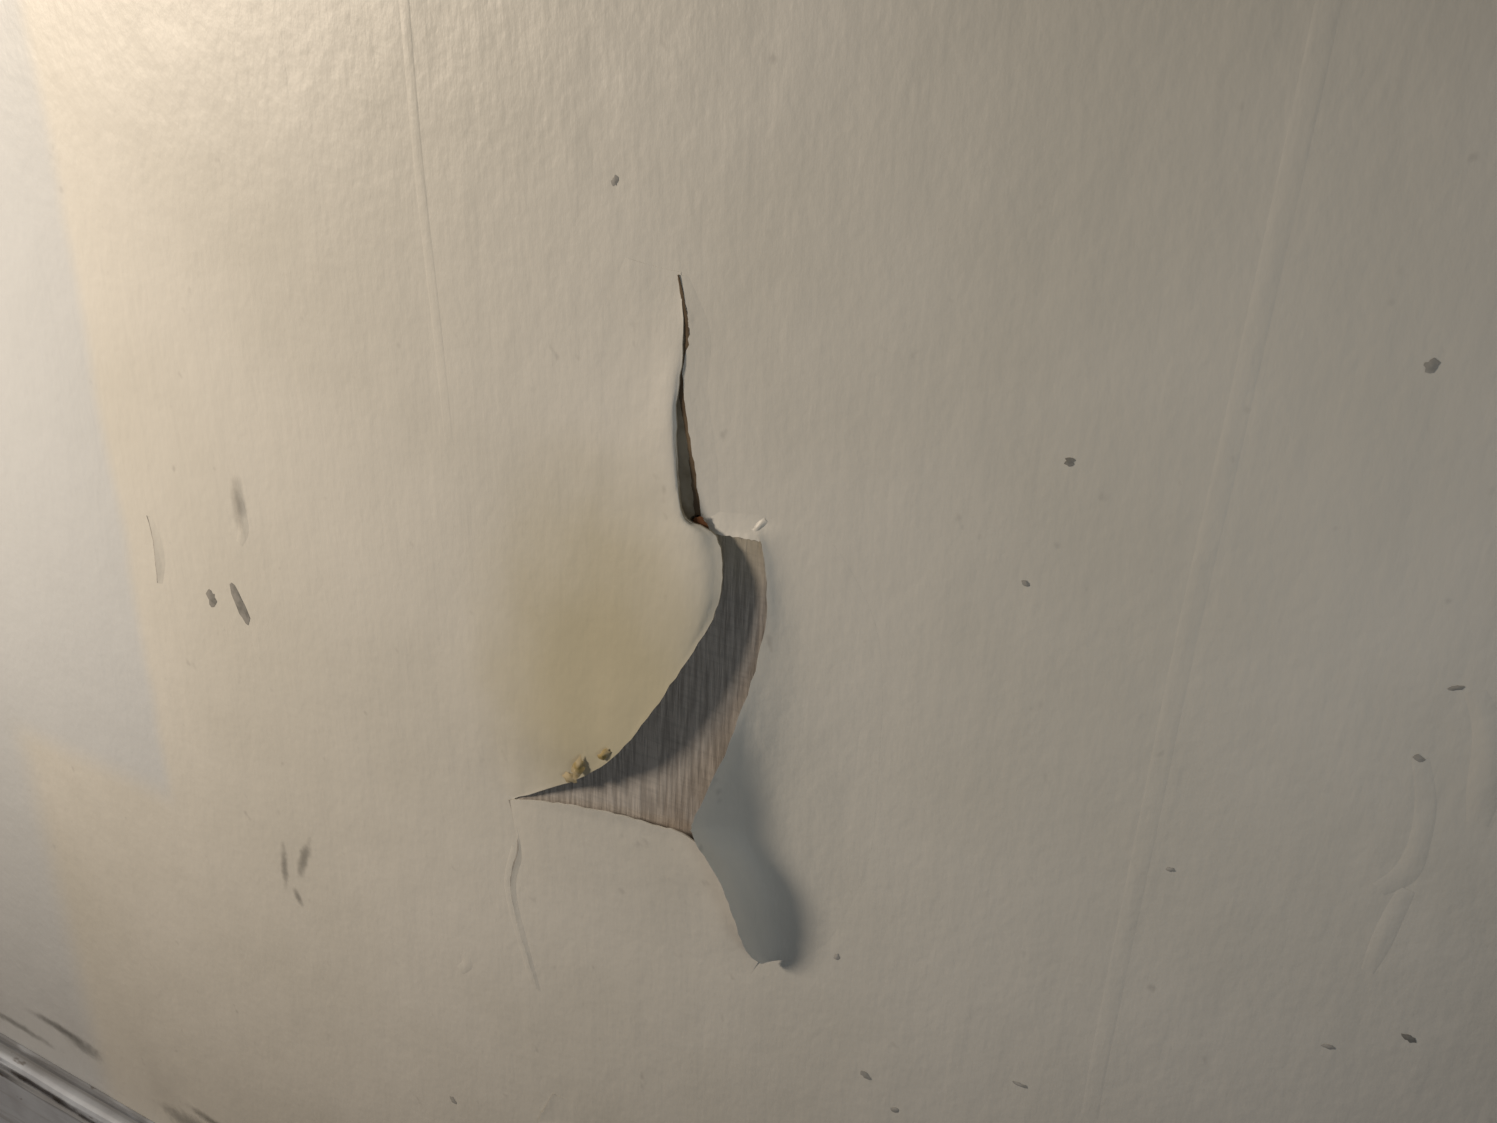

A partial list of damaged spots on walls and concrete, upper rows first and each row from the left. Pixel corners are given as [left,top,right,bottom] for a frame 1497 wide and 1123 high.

crack [504,800,541,991]
peeling [436,258,882,974]